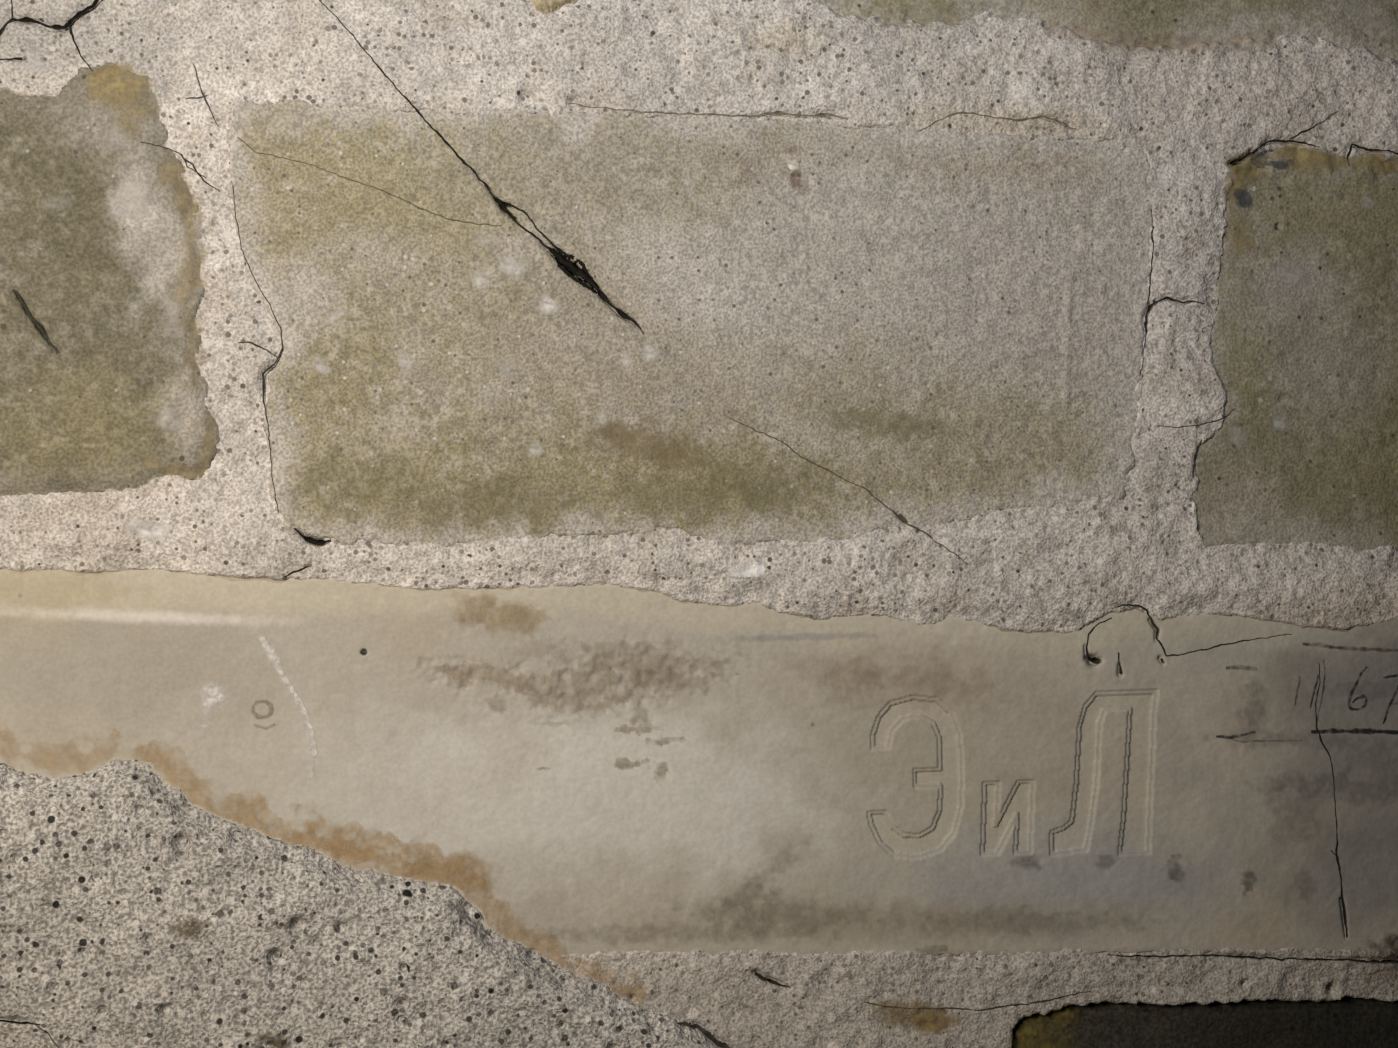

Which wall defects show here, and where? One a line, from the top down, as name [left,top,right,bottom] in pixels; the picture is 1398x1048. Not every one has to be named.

crack [0,0,99,83]
crack [570,103,848,119]
crack [917,112,1076,132]
crack [185,0,644,334]
crack [730,418,968,565]
crack [1085,604,1292,674]